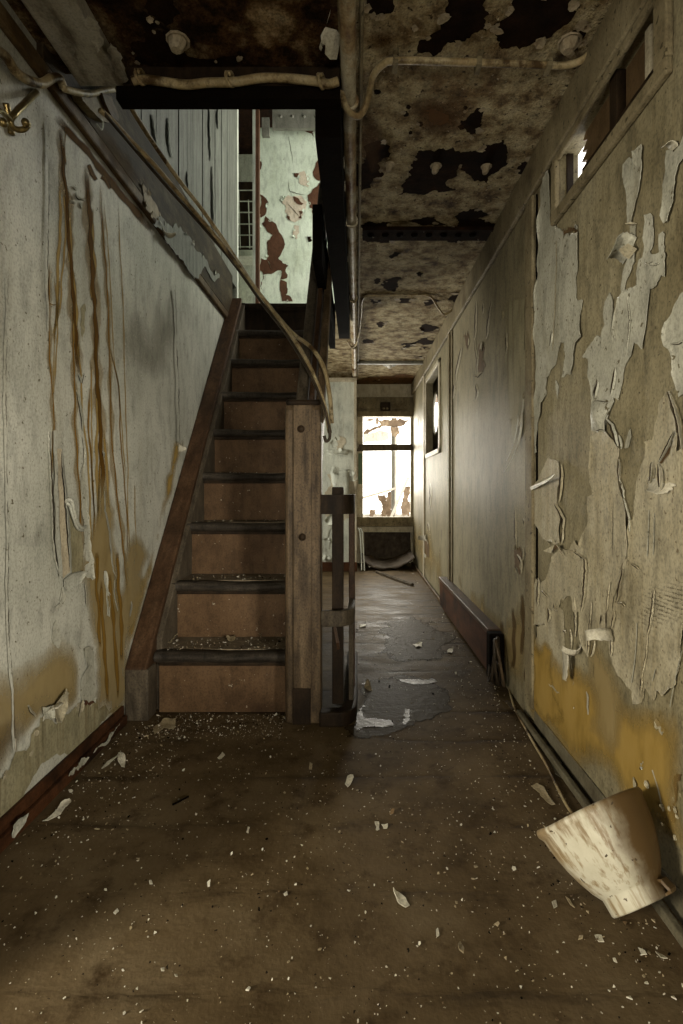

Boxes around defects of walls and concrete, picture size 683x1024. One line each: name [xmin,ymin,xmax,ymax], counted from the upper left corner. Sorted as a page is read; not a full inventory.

spalling [411,0,592,58]
spalling [399,105,530,195]
peeling [142,183,220,282]
peeling [260,161,320,303]
spalling [361,208,496,259]
corrosion [49,121,148,581]
spalling [370,277,459,306]
spalling [401,324,439,358]
peeling [514,137,683,706]
peeling [0,646,119,817]
water stain [471,597,675,832]
peeling [12,813,29,838]